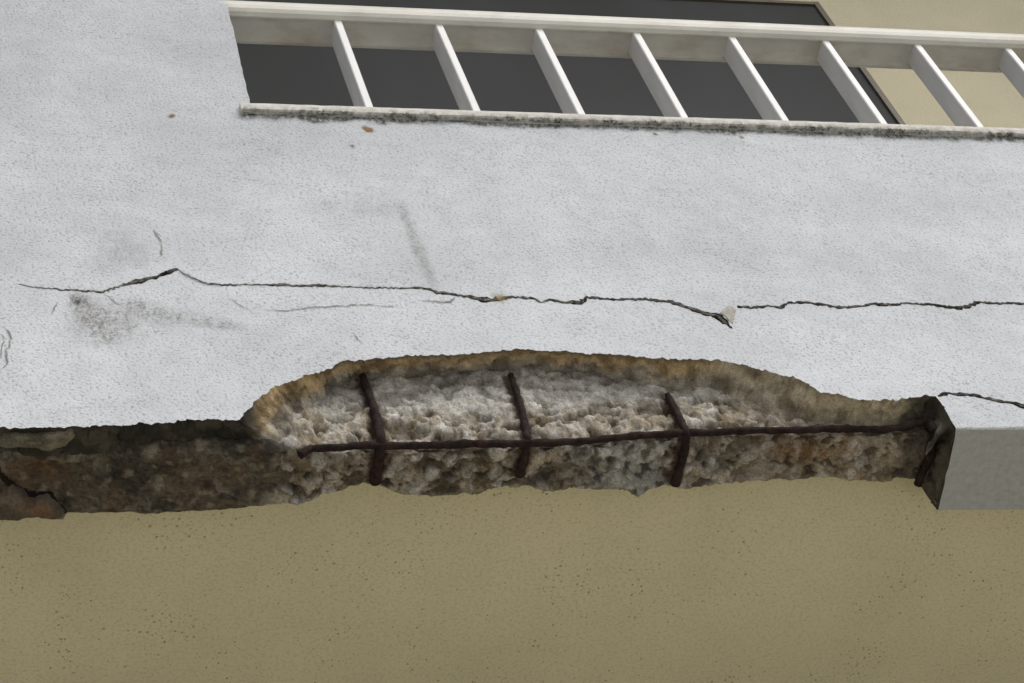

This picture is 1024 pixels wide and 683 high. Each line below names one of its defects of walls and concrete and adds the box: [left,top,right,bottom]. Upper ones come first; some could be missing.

leakage [242,107,1024,142]
crack [19,232,1024,329]
spalling [0,348,956,521]
crack [937,392,1024,409]